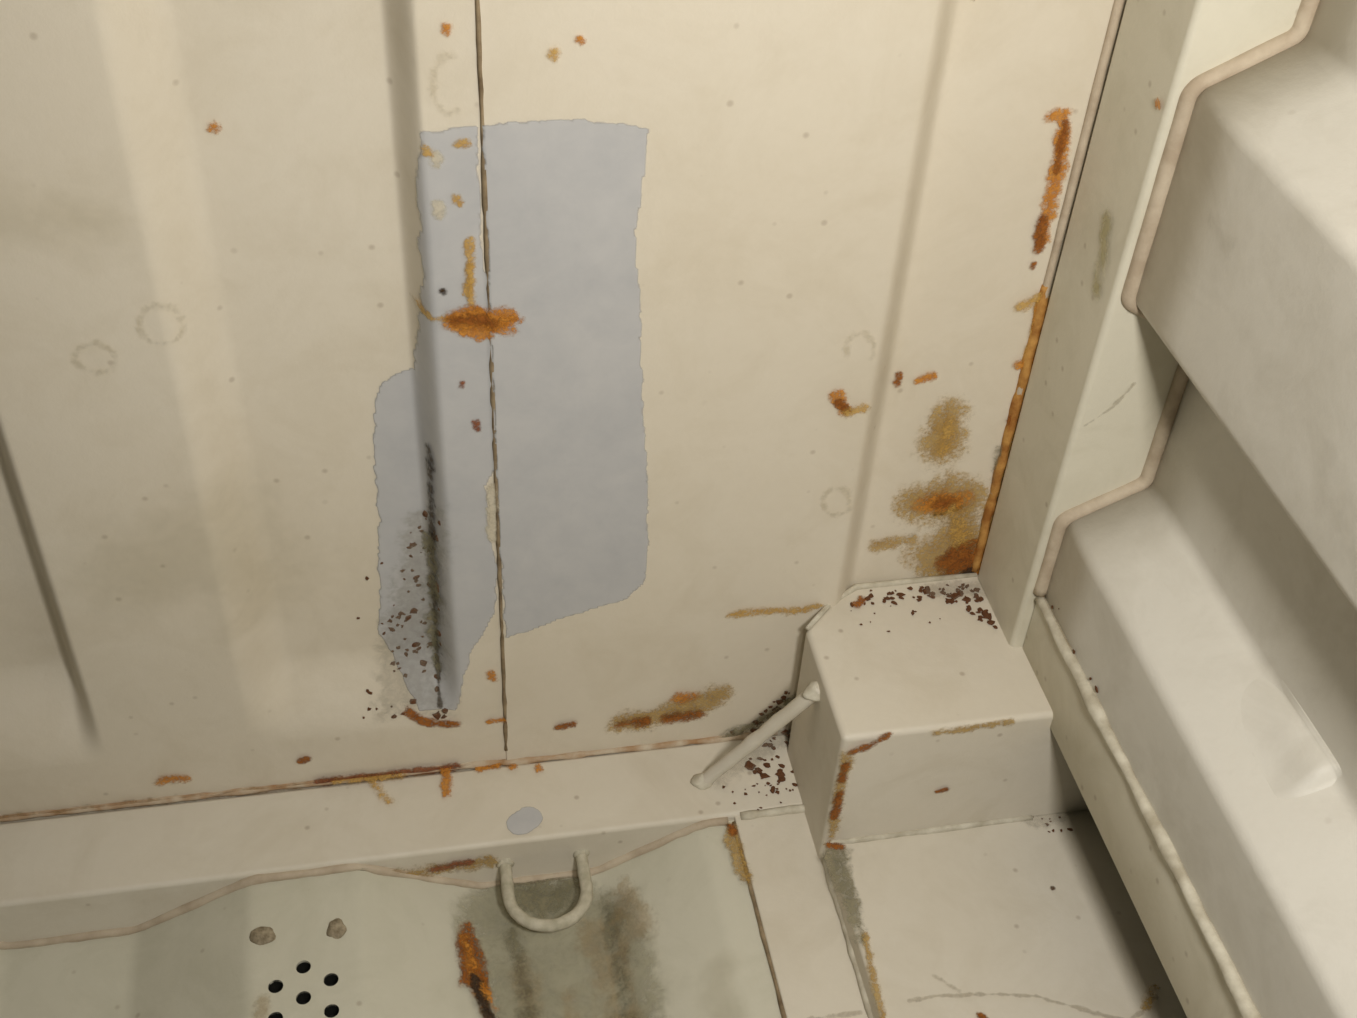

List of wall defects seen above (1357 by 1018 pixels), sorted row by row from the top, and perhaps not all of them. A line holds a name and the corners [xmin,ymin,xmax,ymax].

rust [1030,108,1071,270]
rust [415,237,522,342]
rust [870,284,1050,576]
peeling [381,510,442,692]
crack [404,445,460,728]
rust [727,604,822,618]
peeling [363,689,417,719]
rust [609,685,732,732]
rust [314,763,518,804]
rust [824,732,892,845]
rust [400,856,498,876]
rust [455,878,657,1018]